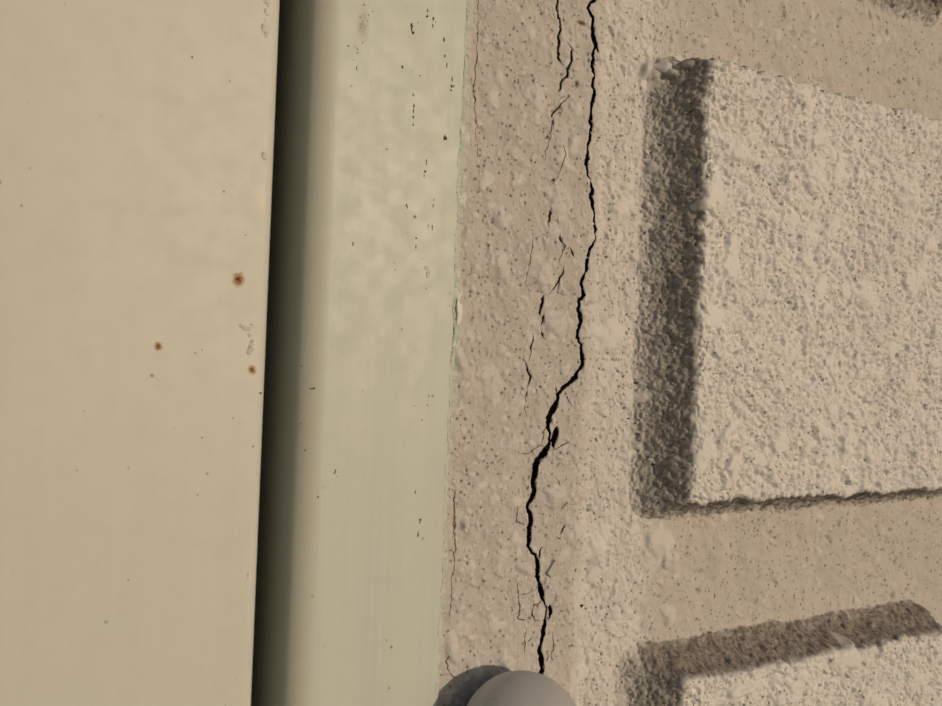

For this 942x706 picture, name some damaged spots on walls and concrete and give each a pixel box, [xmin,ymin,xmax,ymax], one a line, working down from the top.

crack [516,0,599,675]